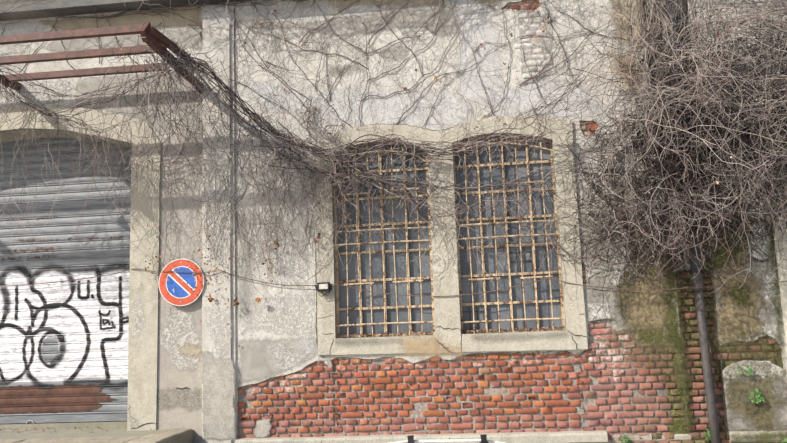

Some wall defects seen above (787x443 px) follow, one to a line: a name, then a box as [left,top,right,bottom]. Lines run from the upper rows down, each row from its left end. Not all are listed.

peeling [0,5,230,73]
peeling [238,0,599,137]
peeling [0,72,202,134]
peeling [249,211,311,278]
damp [711,202,781,348]
flaking render [157,238,691,441]
corrosion [0,384,117,414]